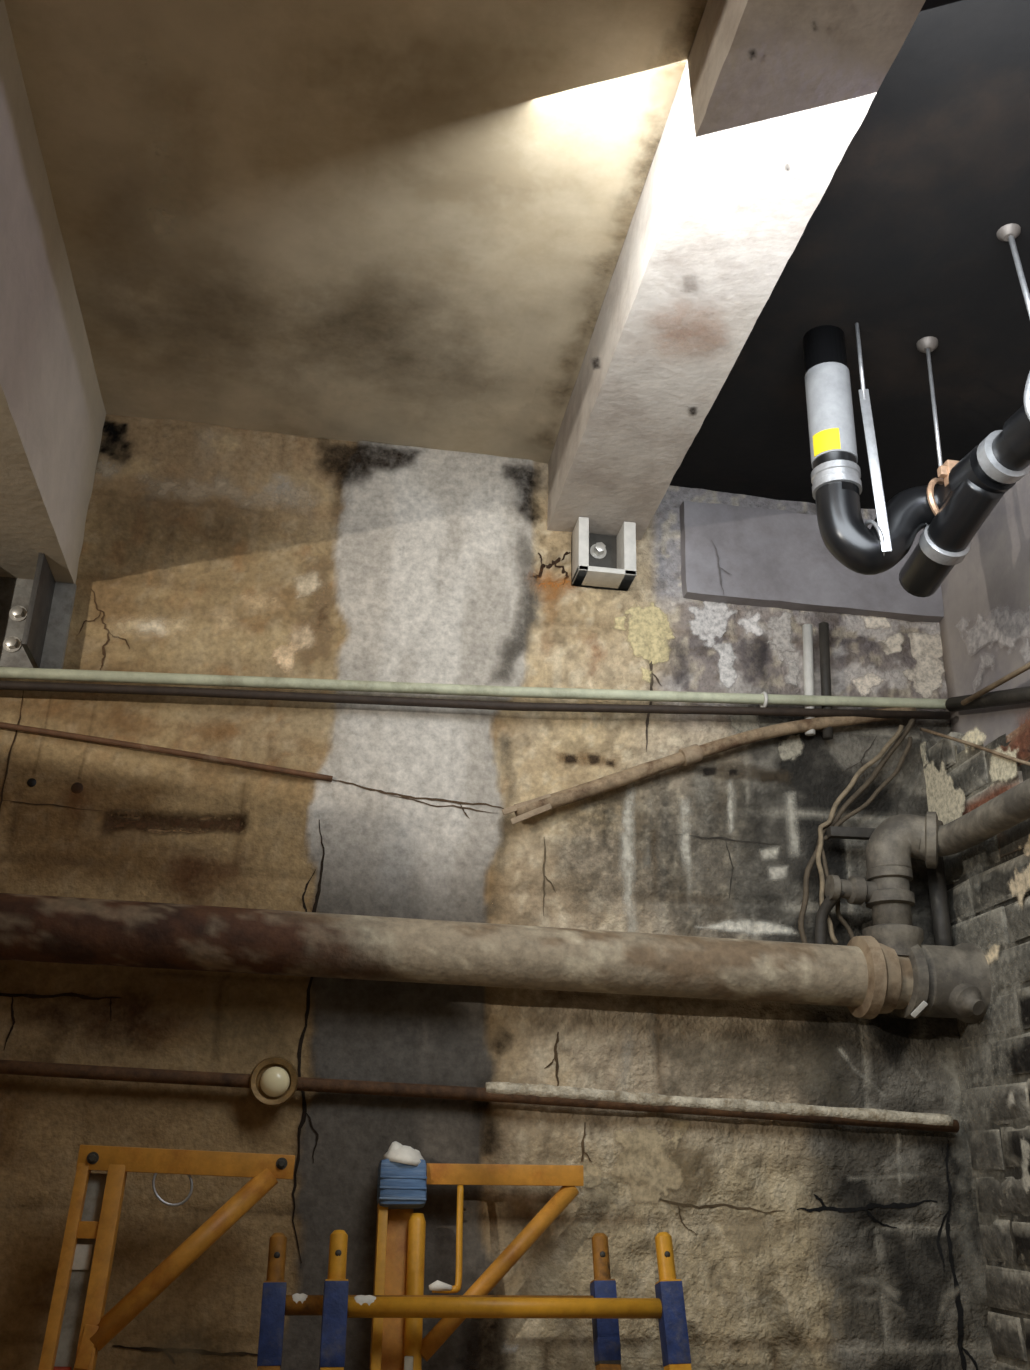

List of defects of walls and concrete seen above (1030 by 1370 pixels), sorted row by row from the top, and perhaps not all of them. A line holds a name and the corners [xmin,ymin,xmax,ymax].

leakage [95,422,131,476]
leakage [321,443,417,482]
leakage [506,467,539,522]
peeling [920,742,965,825]
peeling [962,728,1017,786]
peeling [1009,834,1030,906]
peeling [985,945,999,964]
crack [0,992,121,1049]
crack [659,1140,978,1370]